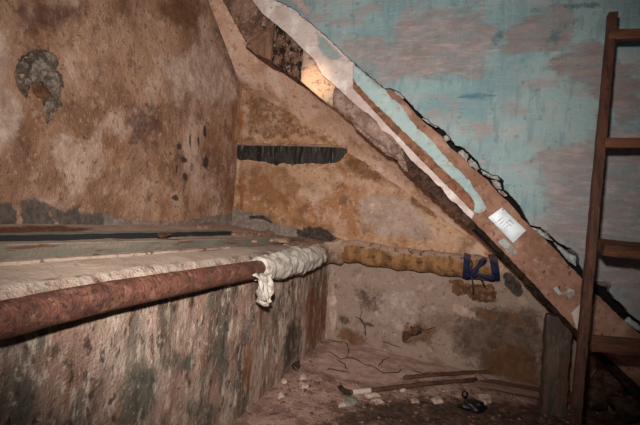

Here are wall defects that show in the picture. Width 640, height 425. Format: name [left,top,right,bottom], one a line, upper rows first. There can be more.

spalling [14,49,64,124]
peeling [550,42,604,97]
peeling [392,89,596,270]
peeling [598,148,640,242]
crack [328,327,435,374]
spalling [402,325,422,343]
spalling [449,280,497,303]
peeling [553,287,575,299]
peeling [572,305,580,328]
peeling [594,250,640,331]